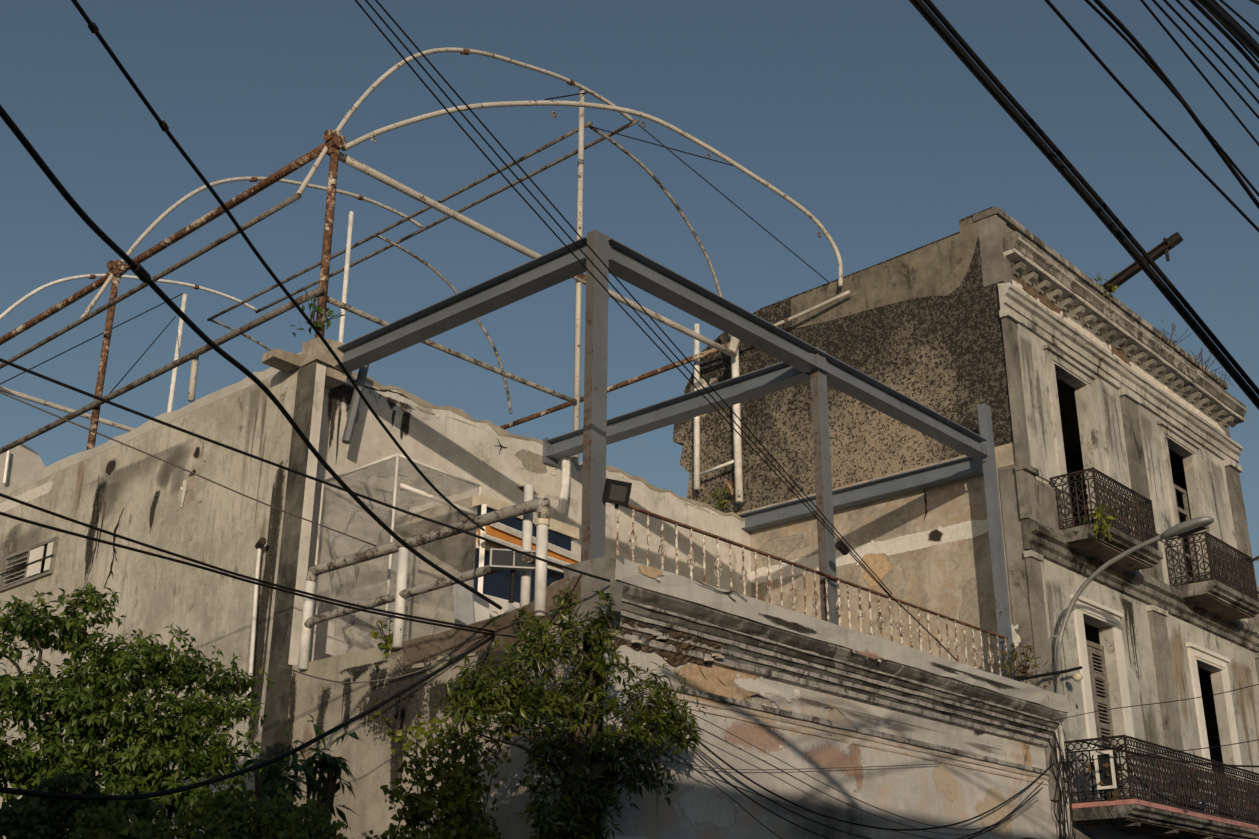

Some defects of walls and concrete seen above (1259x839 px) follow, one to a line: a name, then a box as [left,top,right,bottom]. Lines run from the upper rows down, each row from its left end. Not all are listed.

damp [85,459,146,577]
damp [149,449,185,529]
peeling [664,653,802,760]
peeling [806,709,867,791]